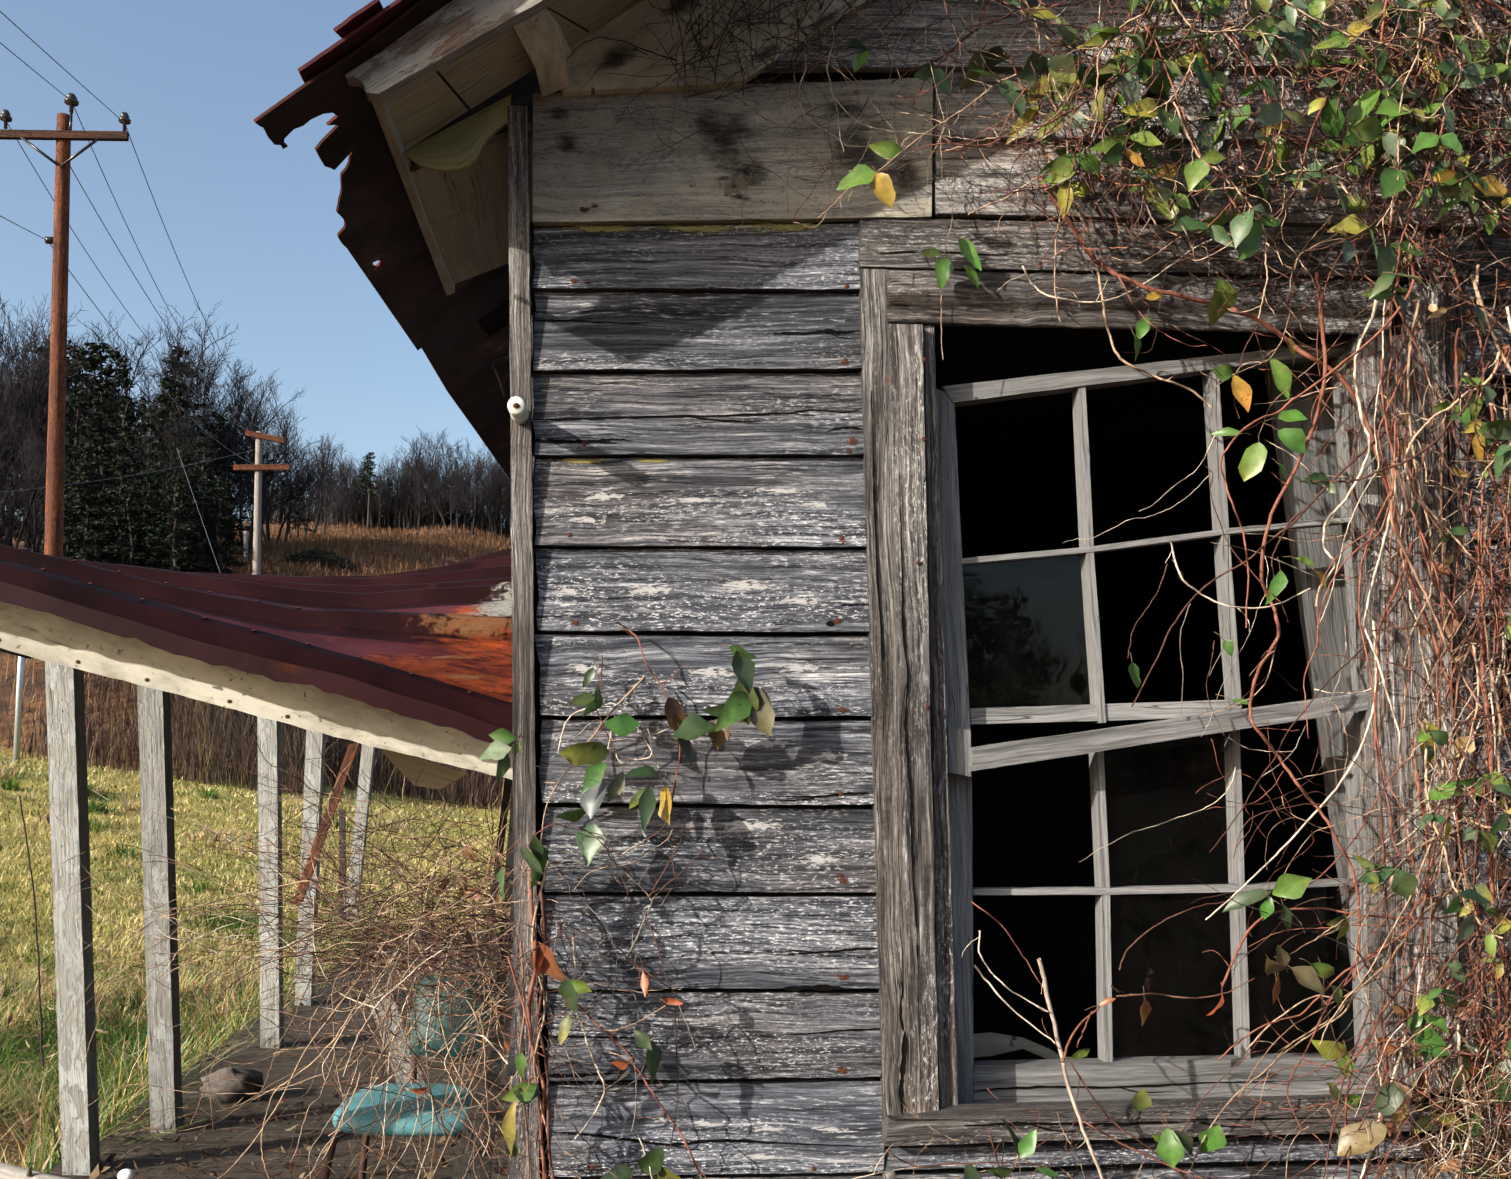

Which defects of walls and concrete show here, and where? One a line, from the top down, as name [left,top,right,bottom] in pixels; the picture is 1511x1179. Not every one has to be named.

leakage [696,113,766,184]
corrosion [370,605,513,703]